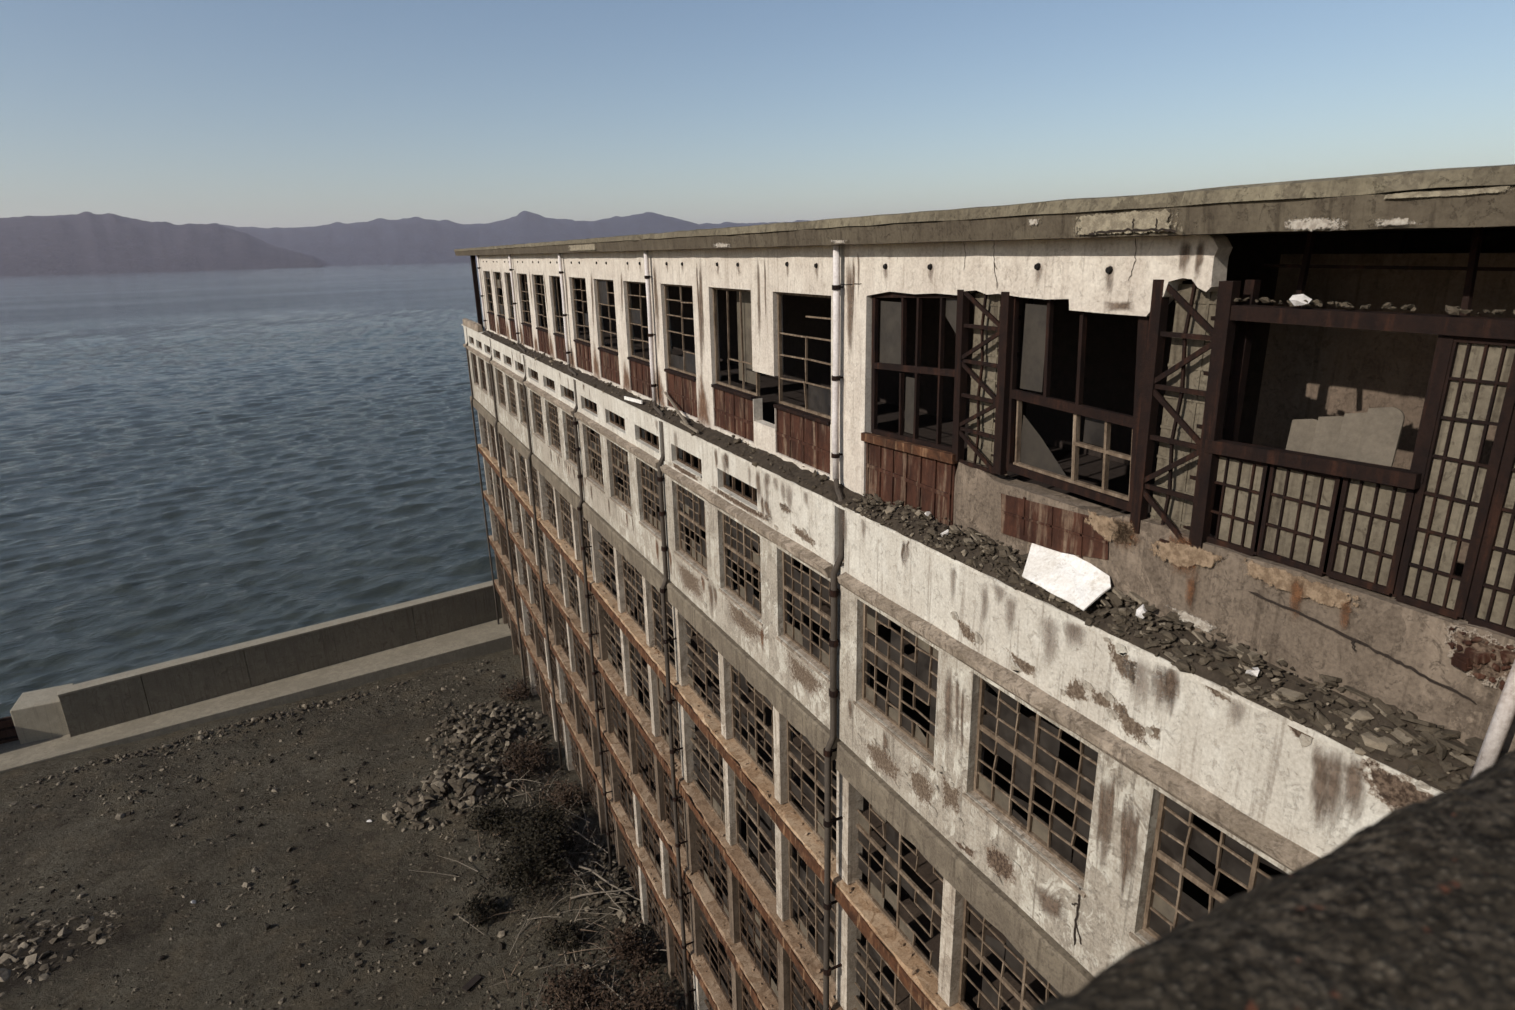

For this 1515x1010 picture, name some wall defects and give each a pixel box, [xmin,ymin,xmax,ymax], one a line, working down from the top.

spalling [1074,209,1182,235]
peeling [1285,217,1345,231]
spalling [1084,509,1223,568]
spalling [1244,558,1359,609]
water stain [463,343,1320,885]
spalling [1444,623,1515,697]
water stain [1312,754,1362,815]